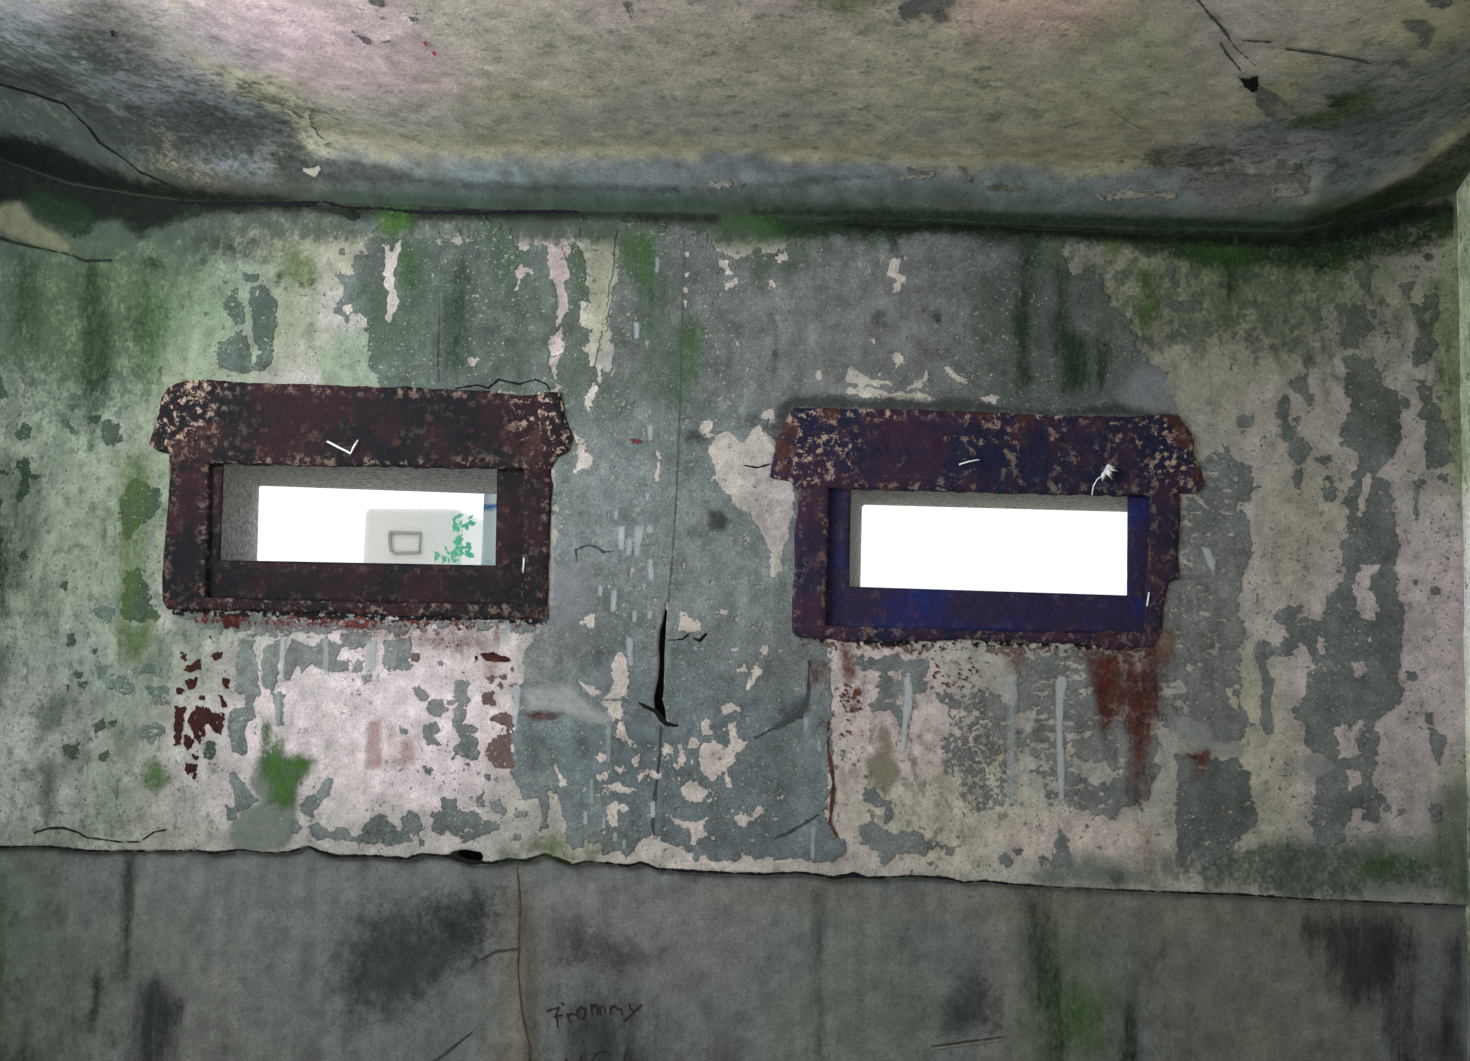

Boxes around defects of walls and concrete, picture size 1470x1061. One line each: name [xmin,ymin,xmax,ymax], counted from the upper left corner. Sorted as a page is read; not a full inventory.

crack [1197,0,1373,73]
crack [0,83,577,222]
peeling [89,212,1455,869]
peeling [65,648,170,744]
rust [173,612,240,779]
crack [0,236,1455,1061]
rust [1091,654,1158,781]
leakage [1302,915,1412,1061]